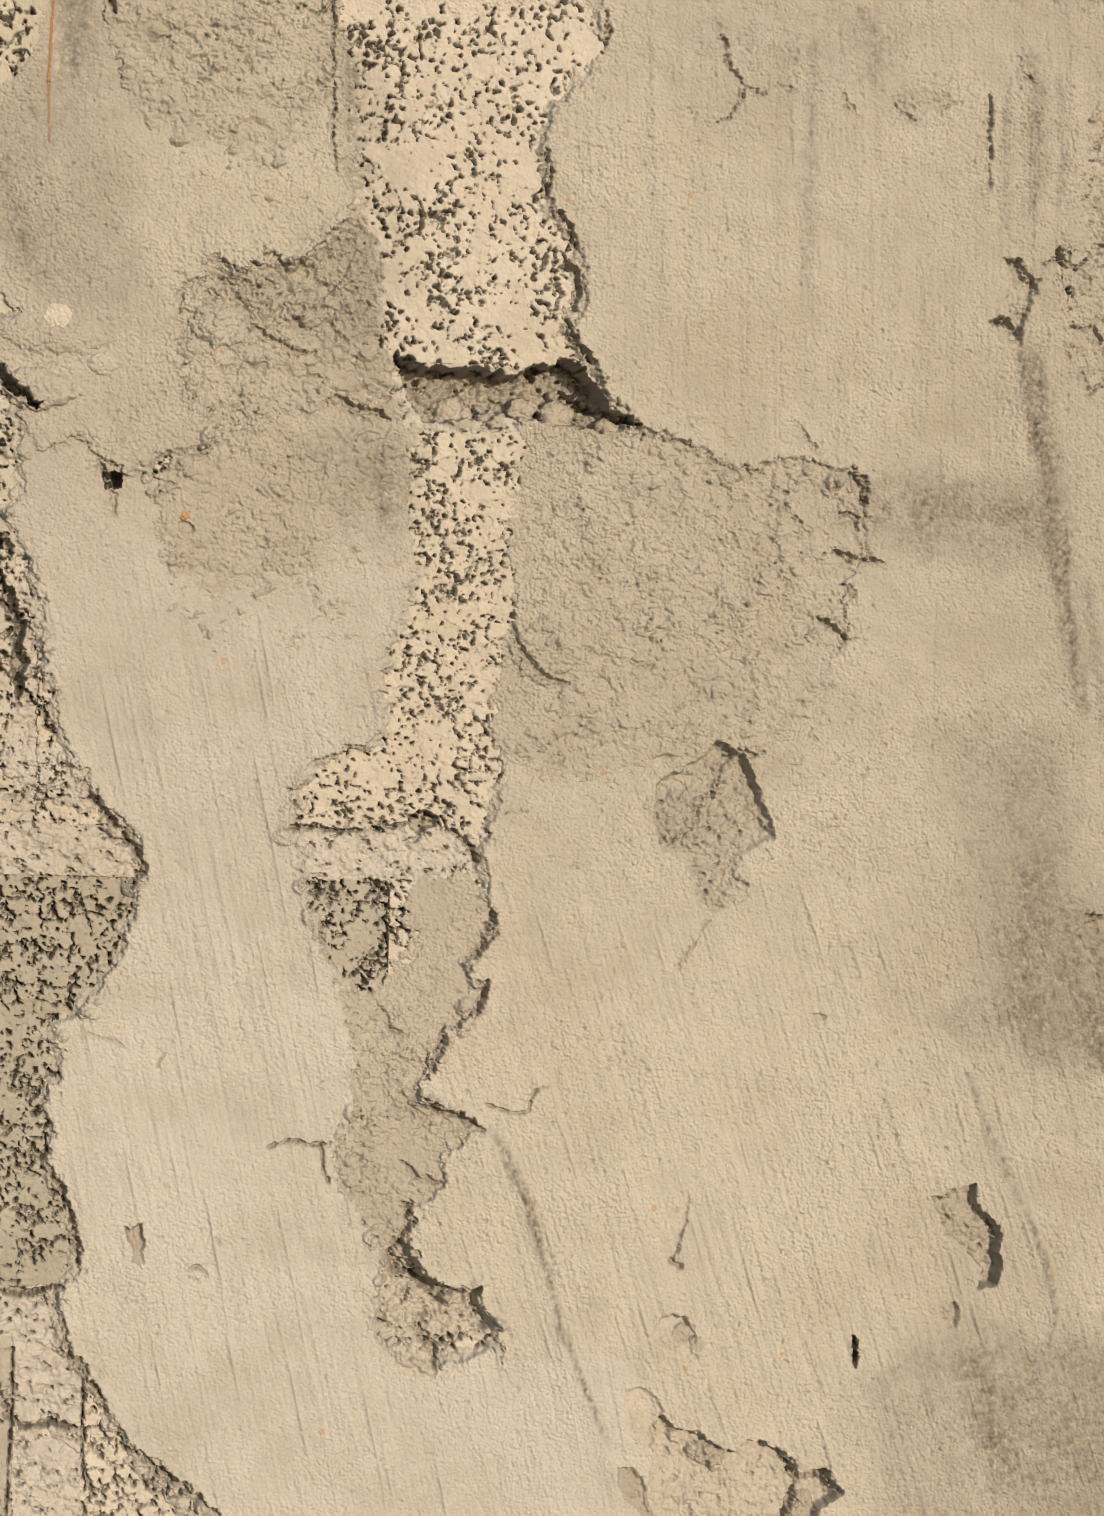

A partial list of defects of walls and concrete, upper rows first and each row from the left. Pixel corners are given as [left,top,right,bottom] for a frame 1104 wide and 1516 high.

crack [716,22,800,124]
crack [838,87,862,119]
spalling [198,195,387,359]
peeling [54,721,162,913]
spalling [650,739,777,915]
peeling [275,682,506,1136]
spalling [40,1157,84,1268]
spalling [125,1223,147,1266]
crack [265,1137,334,1186]
spalling [374,1199,511,1382]
spalling [931,1183,1004,1291]
spalling [617,1386,845,1516]